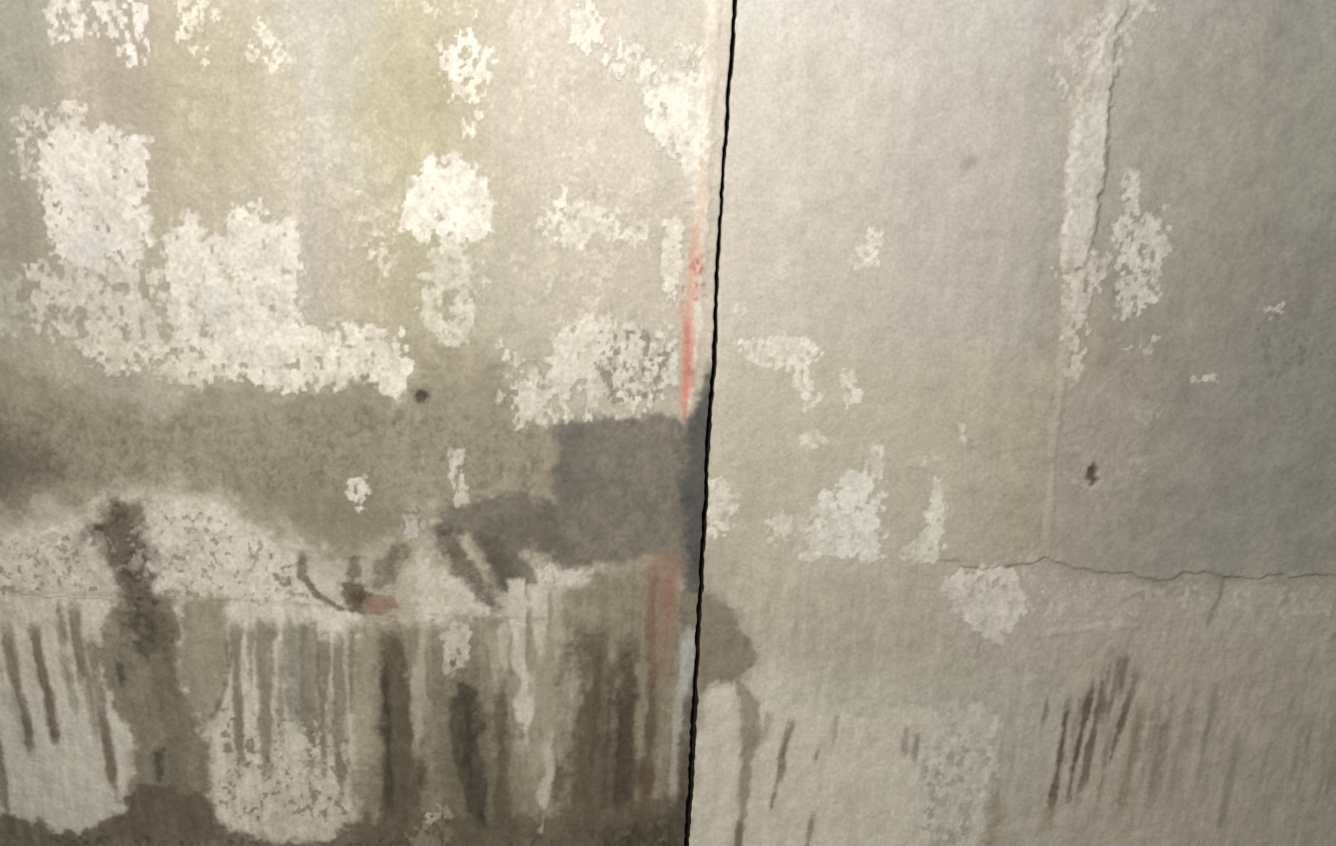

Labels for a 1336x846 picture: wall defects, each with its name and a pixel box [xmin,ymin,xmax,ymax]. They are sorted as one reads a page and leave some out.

peeling [0,0,683,432]
leakage [0,330,798,846]
peeling [532,0,719,303]
corrosion [675,138,713,425]
crack [684,0,738,846]
leakage [803,810,818,846]
peeling [762,407,1033,648]
leakage [897,723,927,770]
spalling [1082,460,1102,489]
peeling [1048,0,1173,389]
leakage [1037,633,1336,839]
crack [1053,559,1336,634]